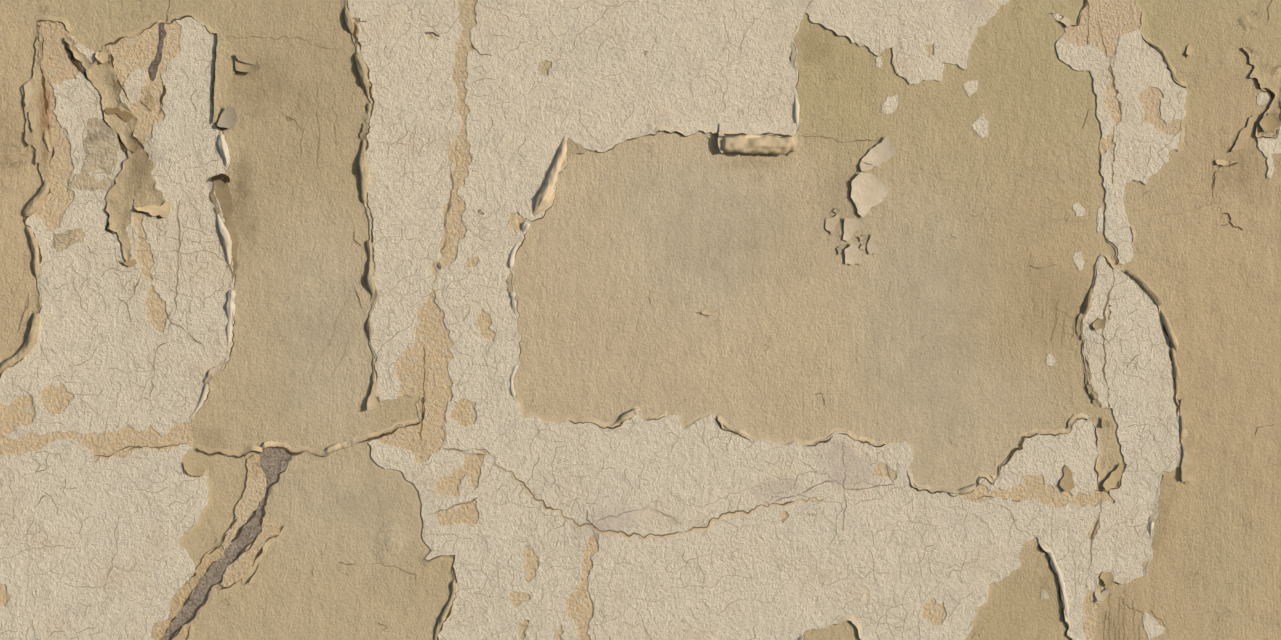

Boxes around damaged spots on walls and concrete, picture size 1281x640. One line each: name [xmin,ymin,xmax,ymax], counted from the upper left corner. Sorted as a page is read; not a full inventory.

peeling [1215,47,1281,178]
peeling [0,11,260,640]
peeling [196,0,1197,640]
crack [420,348,894,540]
crack [152,447,293,640]